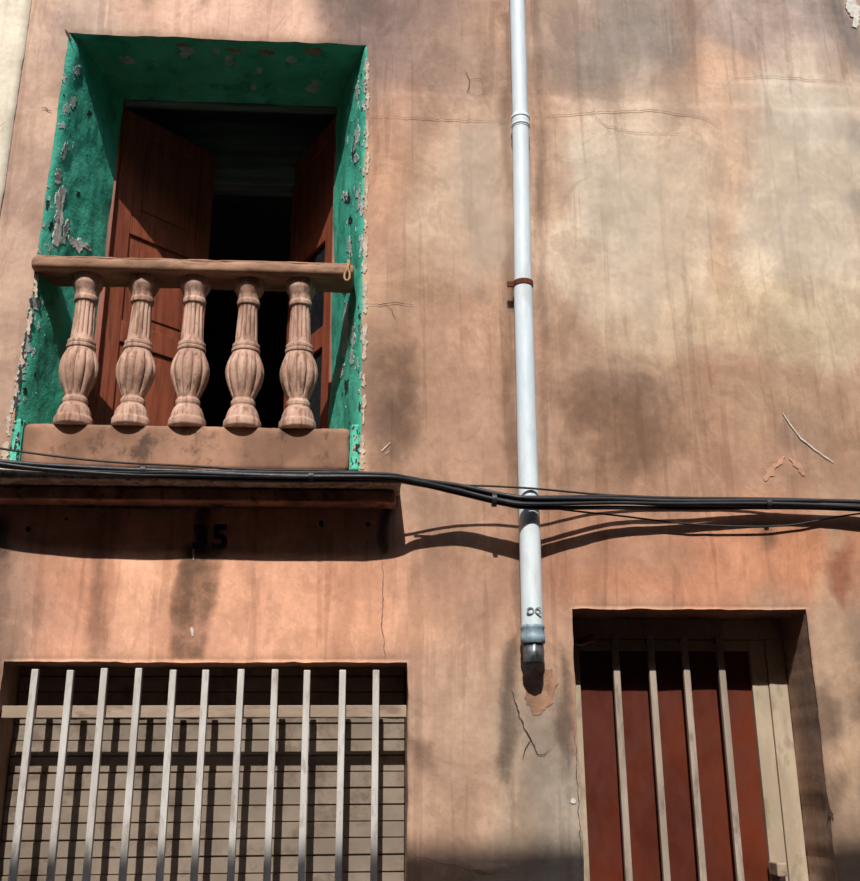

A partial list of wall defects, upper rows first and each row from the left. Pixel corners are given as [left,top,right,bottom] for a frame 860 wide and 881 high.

spalling [845,0,860,30]
peeling [37,65,91,256]
crack [538,109,720,134]
peeling [338,58,371,470]
peeling [1,274,49,460]
damp [174,507,211,623]
crack [511,690,551,757]
spalling [522,668,558,715]